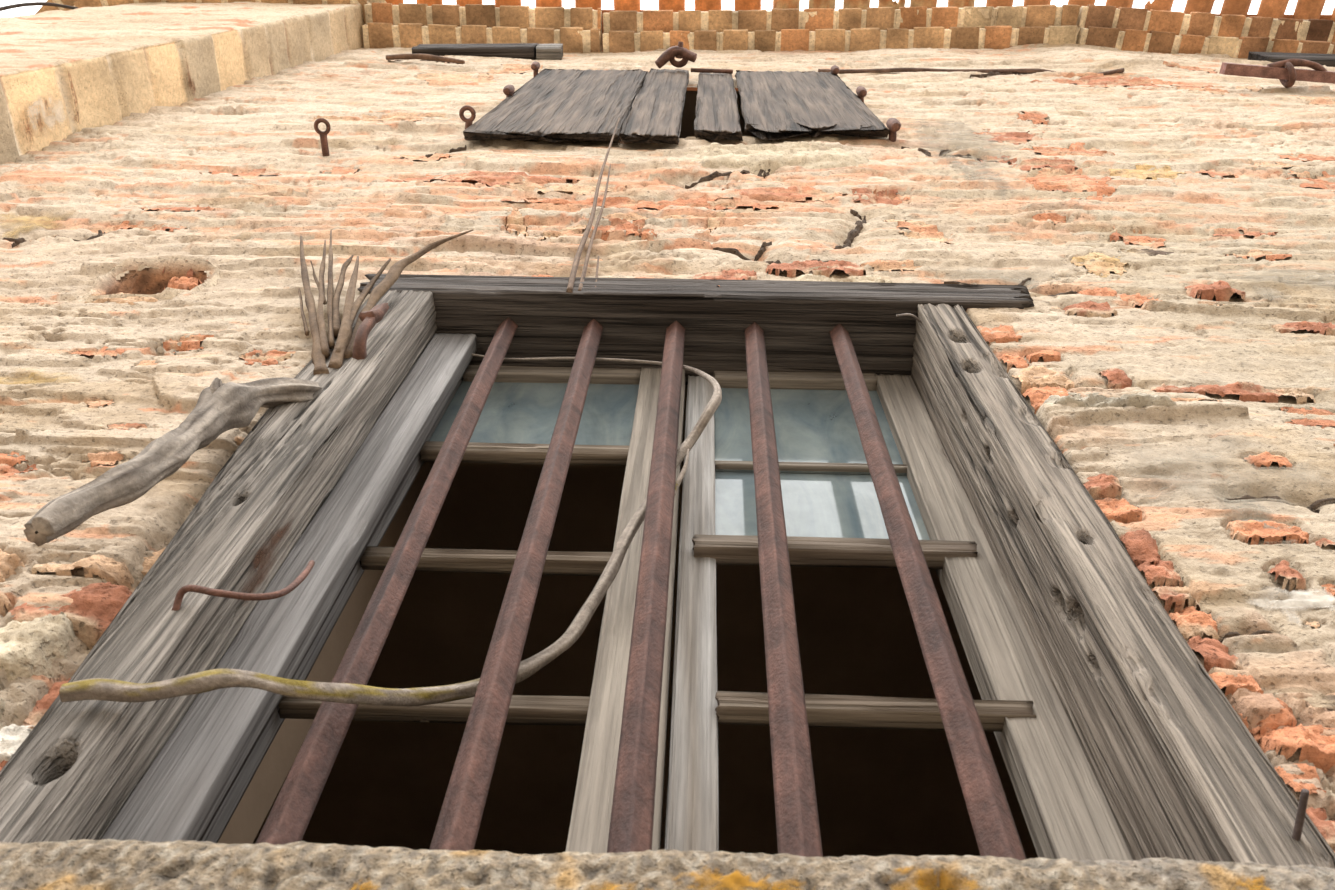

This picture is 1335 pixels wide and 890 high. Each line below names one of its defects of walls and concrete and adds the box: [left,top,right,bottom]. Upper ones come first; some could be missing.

flaking render [85,260,202,305]
spalling [1243,451,1293,470]
spalling [0,547,166,771]
spalling [1083,473,1335,853]